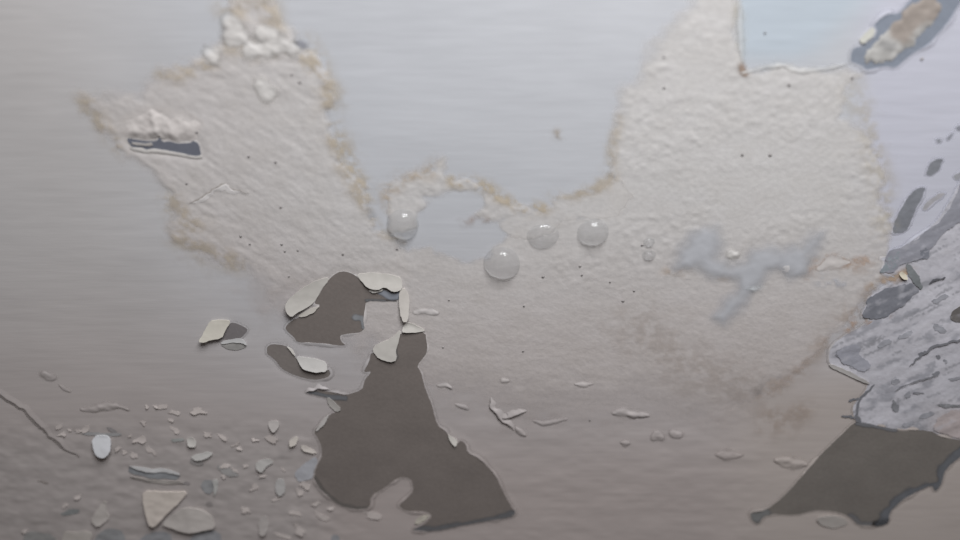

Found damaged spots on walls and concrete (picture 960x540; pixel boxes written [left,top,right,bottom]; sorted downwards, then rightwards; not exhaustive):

peeling [848,0,960,73]
flaking render [125,109,203,159]
damp [83,0,891,405]
crack [0,389,80,458]
peeling [55,271,517,540]
peeling [748,421,960,528]
peeling [21,501,125,540]